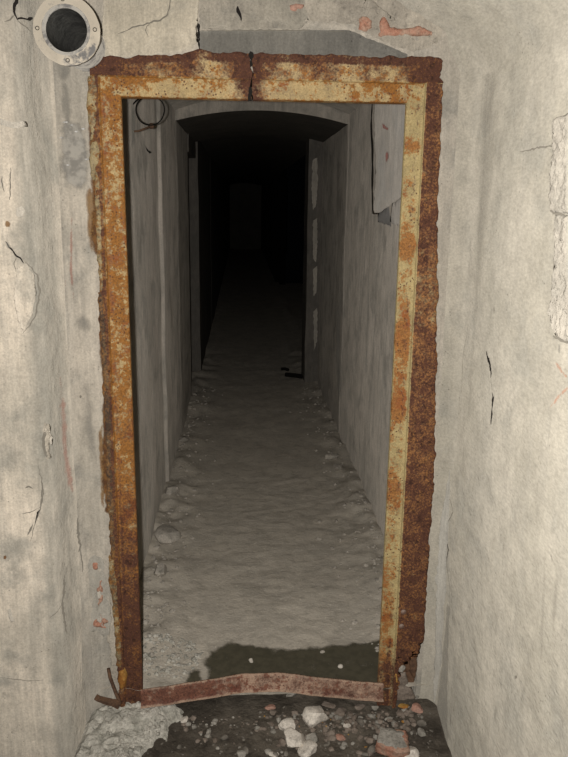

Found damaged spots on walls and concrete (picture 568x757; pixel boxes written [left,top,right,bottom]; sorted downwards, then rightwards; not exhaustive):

crack [4,0,33,32]
crack [118,0,171,35]
flaking render [102,0,442,60]
rust [87,179,98,254]
flaking render [547,113,568,344]
crack [486,351,494,422]
rust [99,404,108,513]
crack [22,467,44,541]
rust [395,657,417,700]